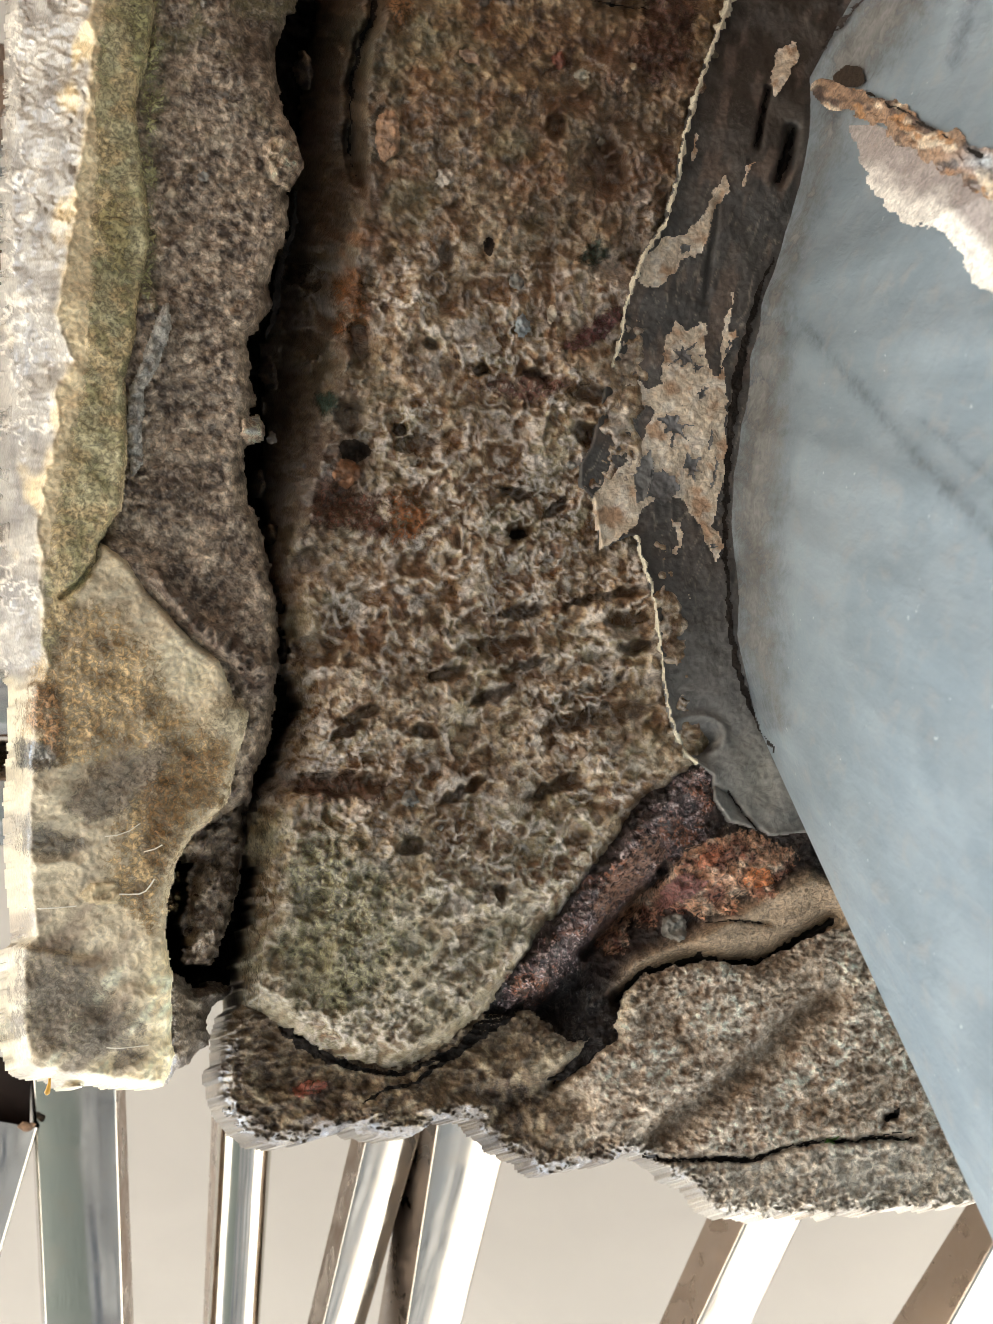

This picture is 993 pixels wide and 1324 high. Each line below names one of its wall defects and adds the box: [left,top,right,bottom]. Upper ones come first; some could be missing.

crack [275,0,316,136]
crack [346,0,378,176]
peeling [770,41,800,97]
peeling [810,65,993,293]
crack [244,187,299,815]
spalling [101,0,756,1084]
crack [165,861,249,988]
corrosion [497,765,800,1013]
spalling [530,779,851,1081]
crack [278,996,533,1104]
crack [642,1108,915,1163]